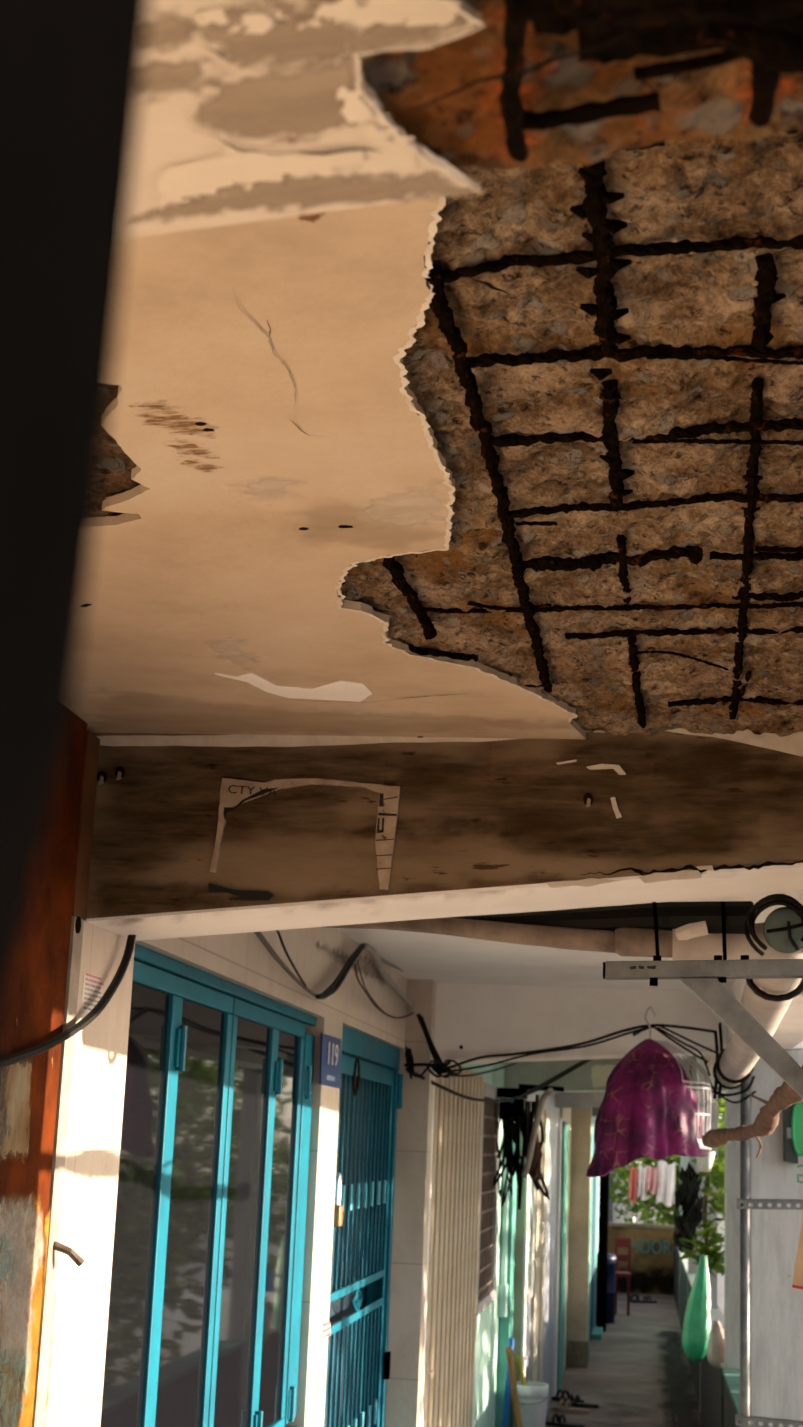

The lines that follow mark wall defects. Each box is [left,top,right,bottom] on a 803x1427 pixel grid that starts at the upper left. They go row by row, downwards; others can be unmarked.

spalling [577,19,720,65]
peeling [135,0,578,723]
leakage [92,742,803,866]
leakage [101,884,223,923]